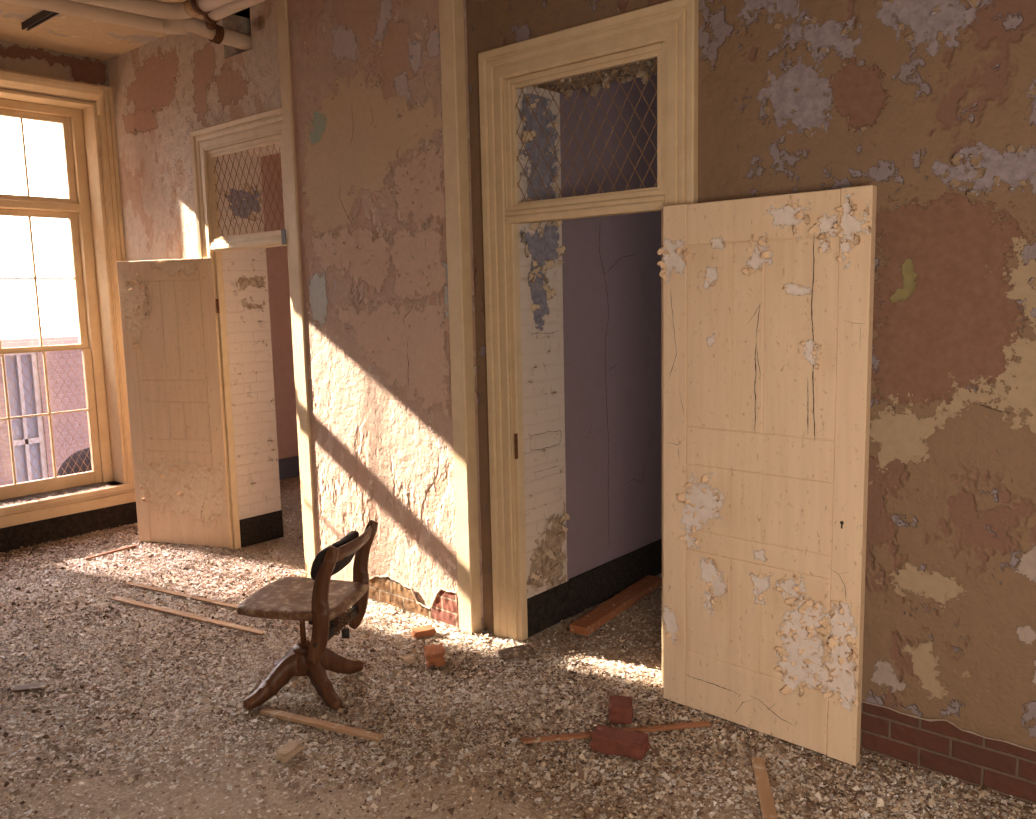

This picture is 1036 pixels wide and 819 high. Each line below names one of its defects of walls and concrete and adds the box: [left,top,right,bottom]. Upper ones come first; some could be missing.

peeling [0,44,107,86]
peeling [122,46,179,136]
peeling [192,42,249,127]
peeling [330,0,393,65]
peeling [731,0,993,137]
peeling [305,272,328,327]
peeling [520,220,566,332]
peeling [527,496,570,594]
peeling [677,472,729,615]
flaking render [368,575,458,629]
peeling [663,605,679,645]
flaking render [749,550,1036,805]